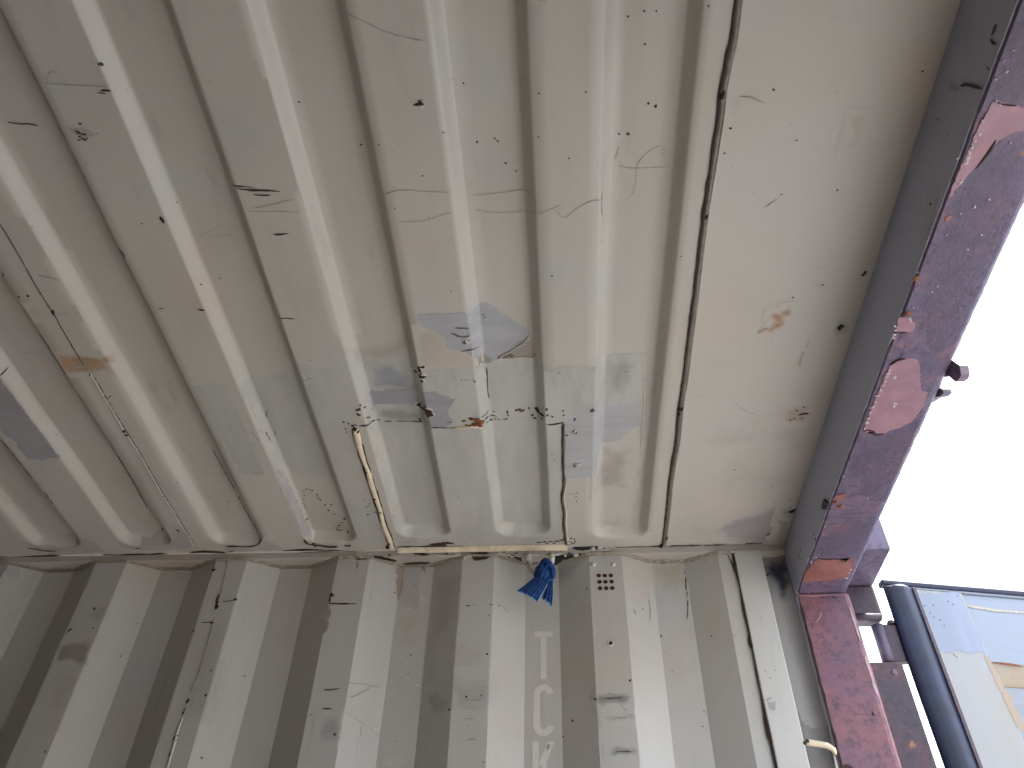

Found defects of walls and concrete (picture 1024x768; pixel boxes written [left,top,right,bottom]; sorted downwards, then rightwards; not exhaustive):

corrosion [980,0,1024,113]
peeling [948,100,1024,197]
corrosion [897,130,1024,379]
peeling [891,307,915,339]
corrosion [462,407,576,427]
peeling [863,358,928,436]
corrosion [798,412,924,561]
peeling [800,550,854,582]
corrosion [801,605,843,768]